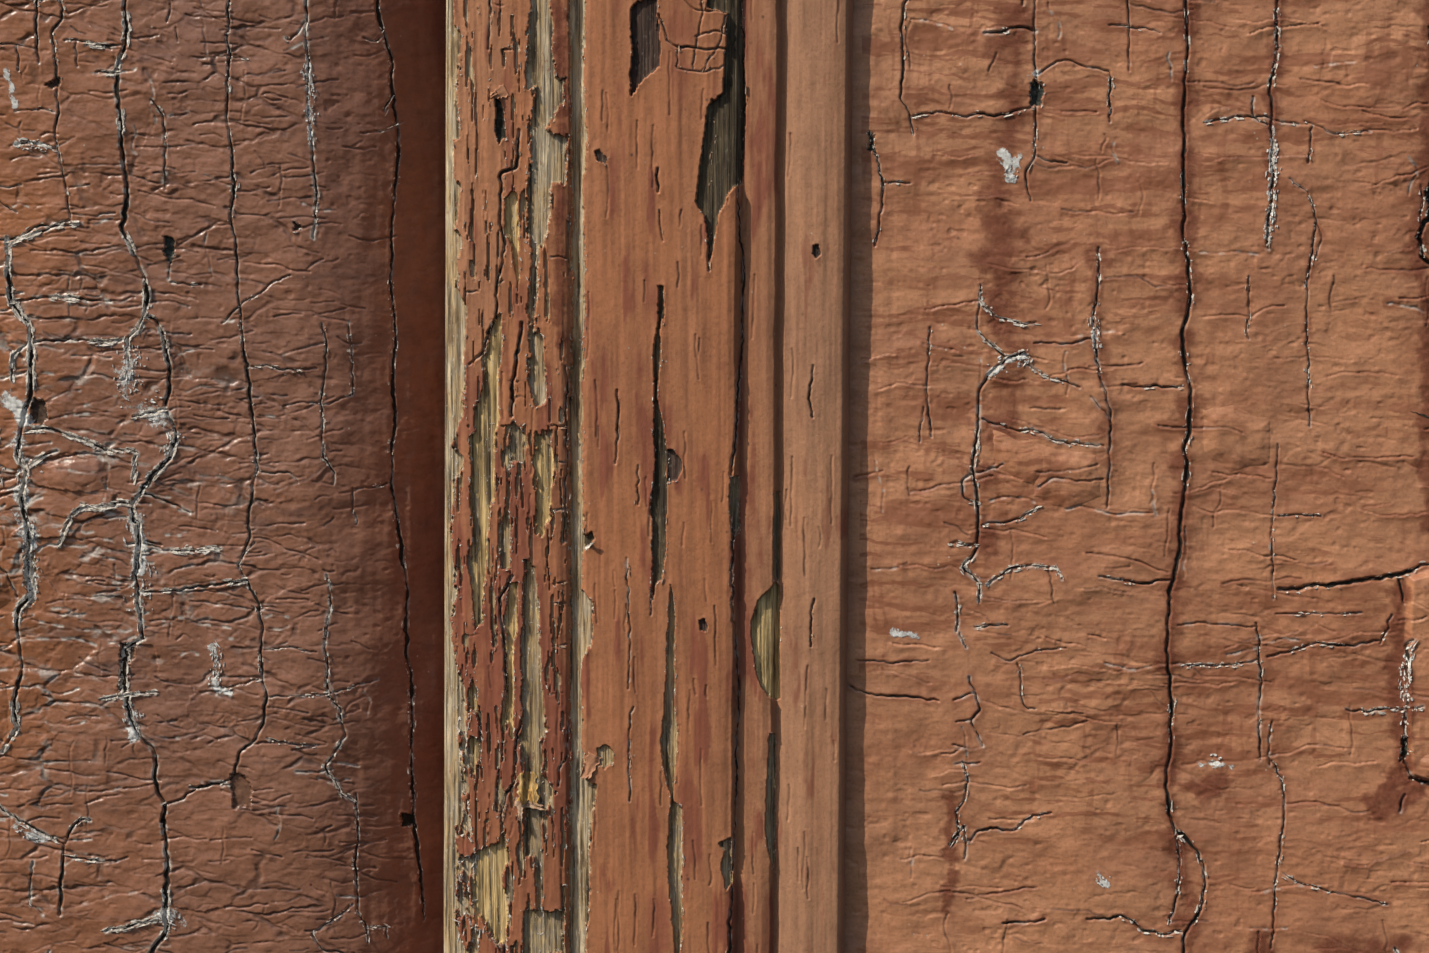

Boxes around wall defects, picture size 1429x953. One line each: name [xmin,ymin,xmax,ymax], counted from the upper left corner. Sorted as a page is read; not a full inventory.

peeling [629,0,661,95]
peeling [696,0,746,267]
crack [0,0,425,953]
peeling [444,0,614,953]
peeling [649,286,685,953]
peeling [728,476,741,541]
peeling [751,491,782,699]
crack [851,0,1429,953]
peeling [719,838,733,889]
peeling [765,732,776,868]